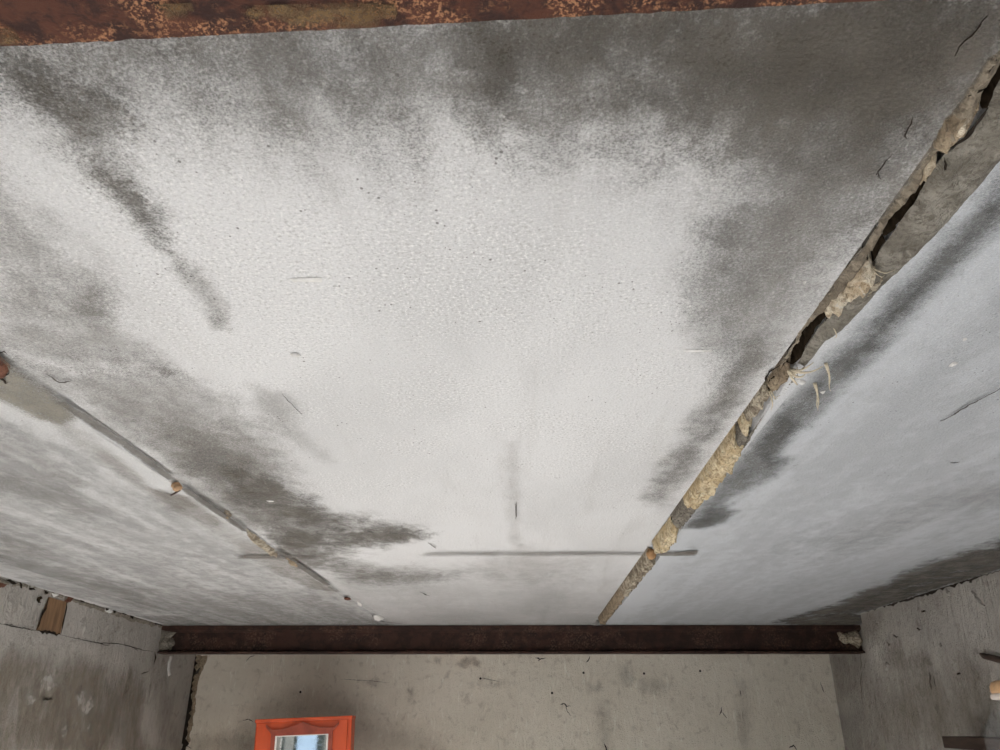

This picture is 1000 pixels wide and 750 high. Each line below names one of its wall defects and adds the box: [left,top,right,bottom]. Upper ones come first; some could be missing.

crack [955,16,987,55]
water stain [825,550,1000,619]